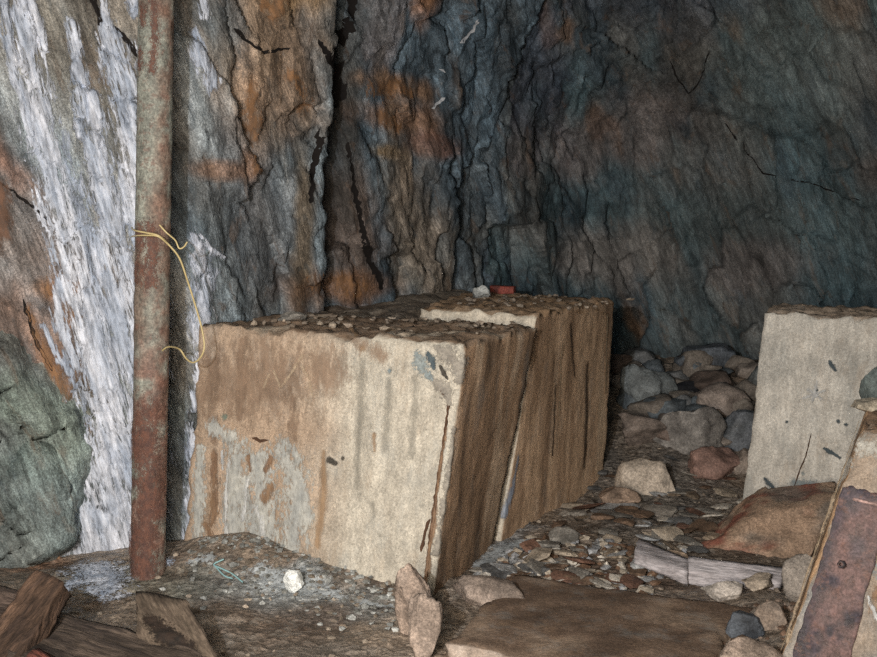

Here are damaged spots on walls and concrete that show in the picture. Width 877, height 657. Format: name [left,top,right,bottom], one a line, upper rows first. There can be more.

corrosion [137,0,162,76]
corrosion [133,217,163,291]
water stain [181,339,344,539]
corrosion [129,391,168,581]
water stain [166,554,215,566]
water stain [248,562,348,602]